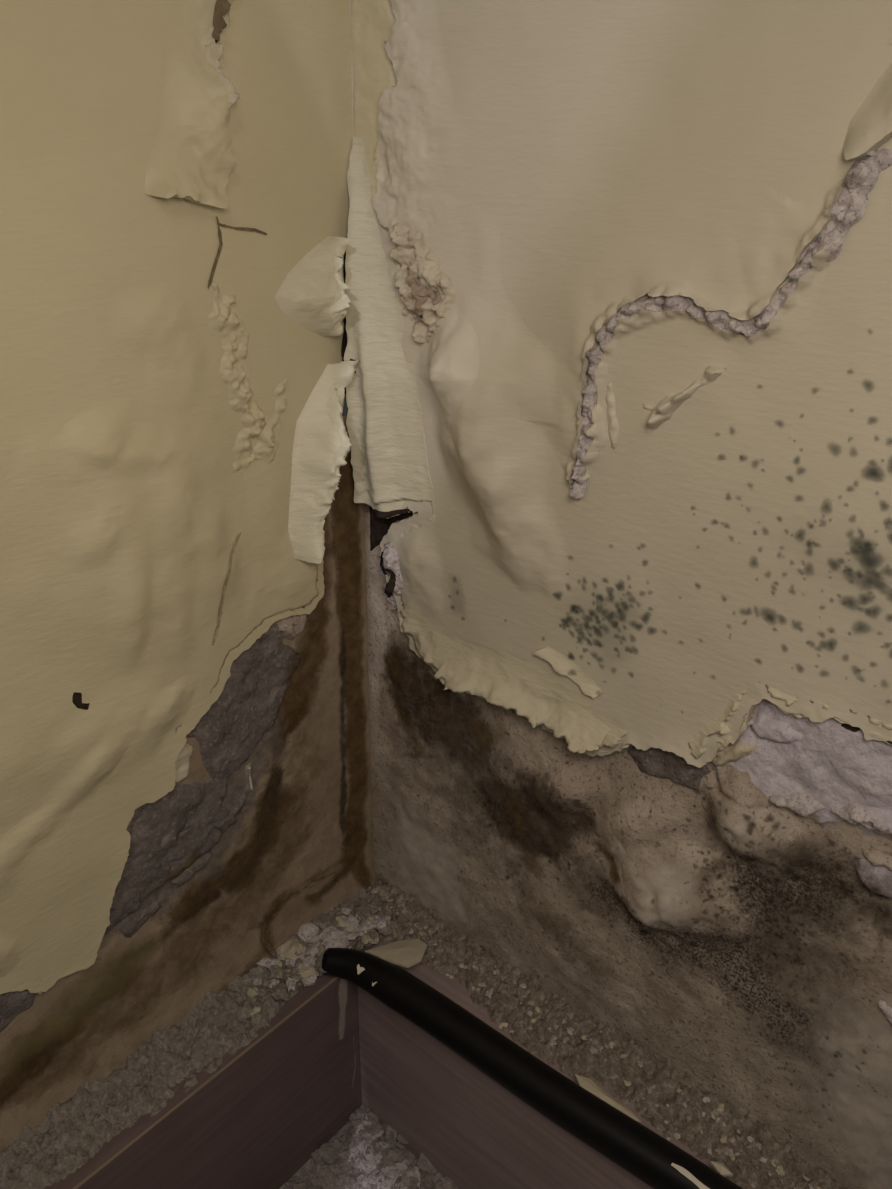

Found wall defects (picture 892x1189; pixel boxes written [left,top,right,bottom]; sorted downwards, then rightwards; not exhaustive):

crack [208,217,267,289]
crack [520,158,879,500]
water stain [0,944,150,1102]
flaking render [0,0,474,1152]
water stain [165,435,466,936]
water stain [385,645,595,878]
flaking render [364,503,892,1189]
water stain [590,816,892,1189]
water stain [846,541,889,613]